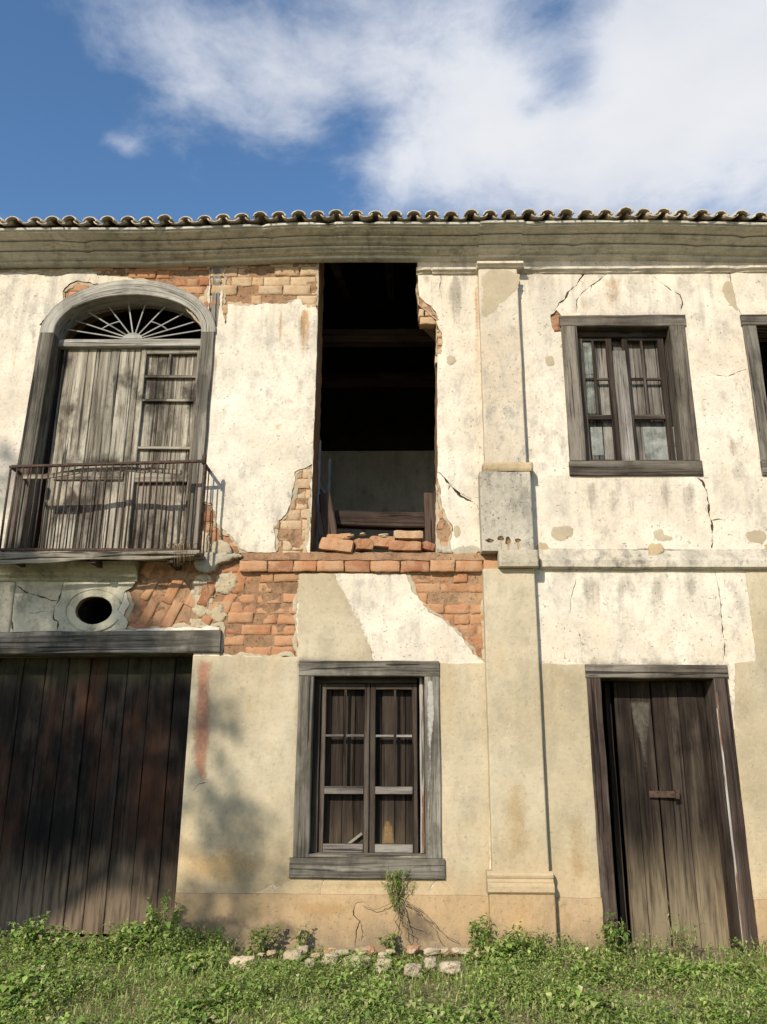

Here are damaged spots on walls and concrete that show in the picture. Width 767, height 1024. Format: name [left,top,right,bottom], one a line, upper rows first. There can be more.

flaking render [0,263,320,324]
crack [555,274,602,310]
flaking render [550,311,561,332]
crack [438,472,479,509]
crack [698,478,722,548]
flaking render [124,465,521,663]
crack [16,585,63,628]